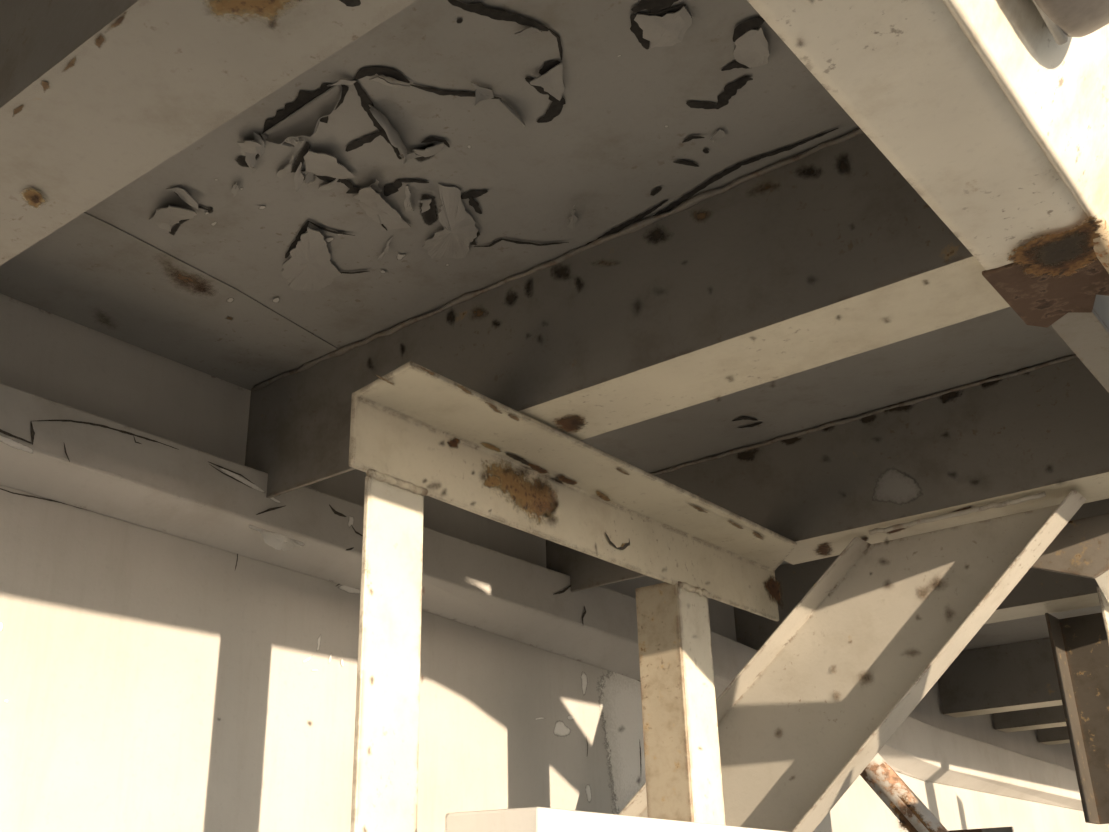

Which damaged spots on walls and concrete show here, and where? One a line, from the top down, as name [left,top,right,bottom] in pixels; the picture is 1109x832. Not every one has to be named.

rust [208,0,301,27]
peeling [630,0,692,49]
peeling [721,18,770,88]
peeling [149,187,217,235]
peeling [235,60,566,291]
crack [384,179,429,196]
crack [474,128,838,247]
rust [1007,216,1104,278]
peeling [0,435,33,453]
rust [473,443,577,524]
peeling [581,670,646,813]
rust [890,796,934,832]